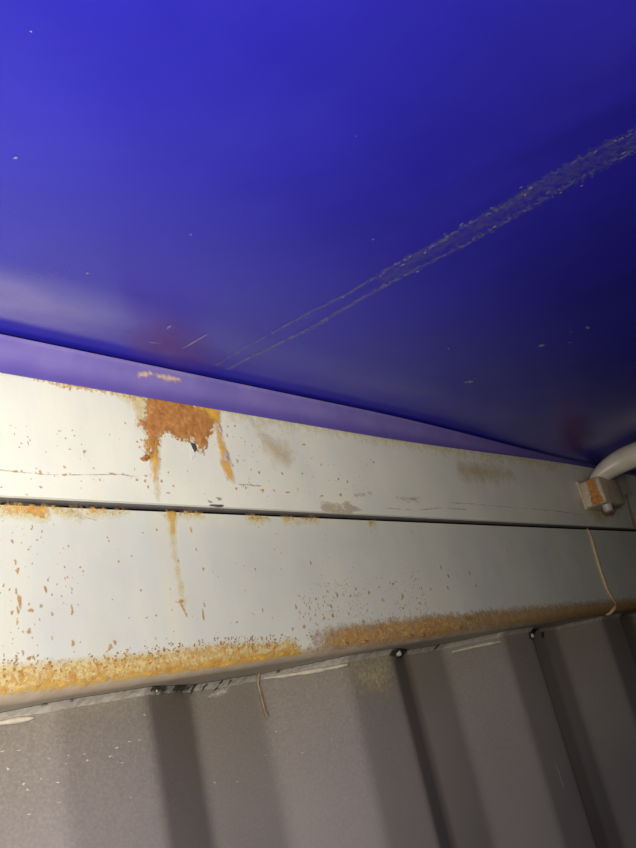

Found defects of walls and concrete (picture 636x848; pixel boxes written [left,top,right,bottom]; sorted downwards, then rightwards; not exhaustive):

corrosion [124,395,253,488]
corrosion [0,505,68,518]
corrosion [0,571,636,694]